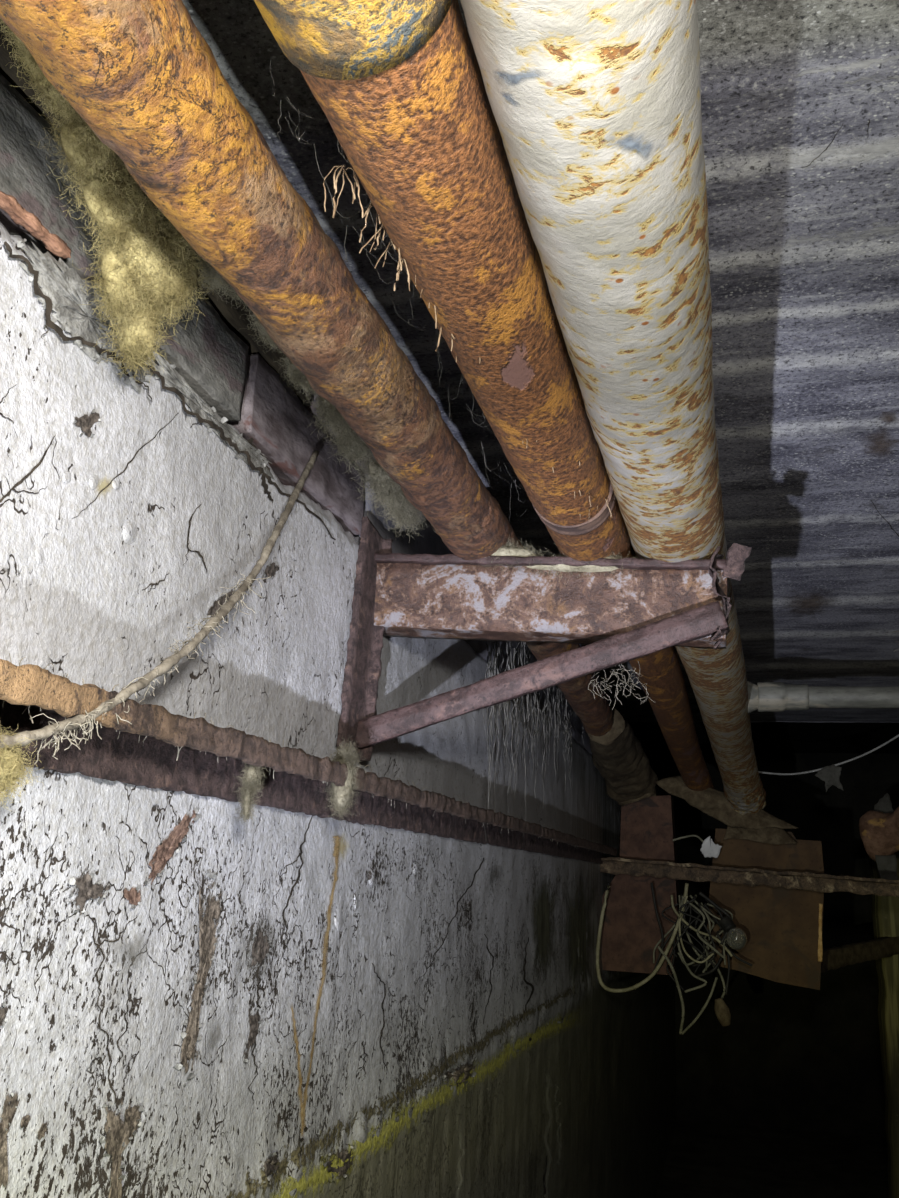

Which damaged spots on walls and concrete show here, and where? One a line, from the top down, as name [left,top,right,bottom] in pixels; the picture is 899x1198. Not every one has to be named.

crack [0,241,336,540]
crack [142,504,207,591]
crack [92,917,137,1103]
peeling [68,809,201,915]
crack [248,966,261,1104]
crack [273,815,313,945]
rust [291,836,345,1136]
crack [361,963,387,1081]
crack [416,858,494,1024]
crack [517,937,534,1027]
water stain [273,1012,579,1198]